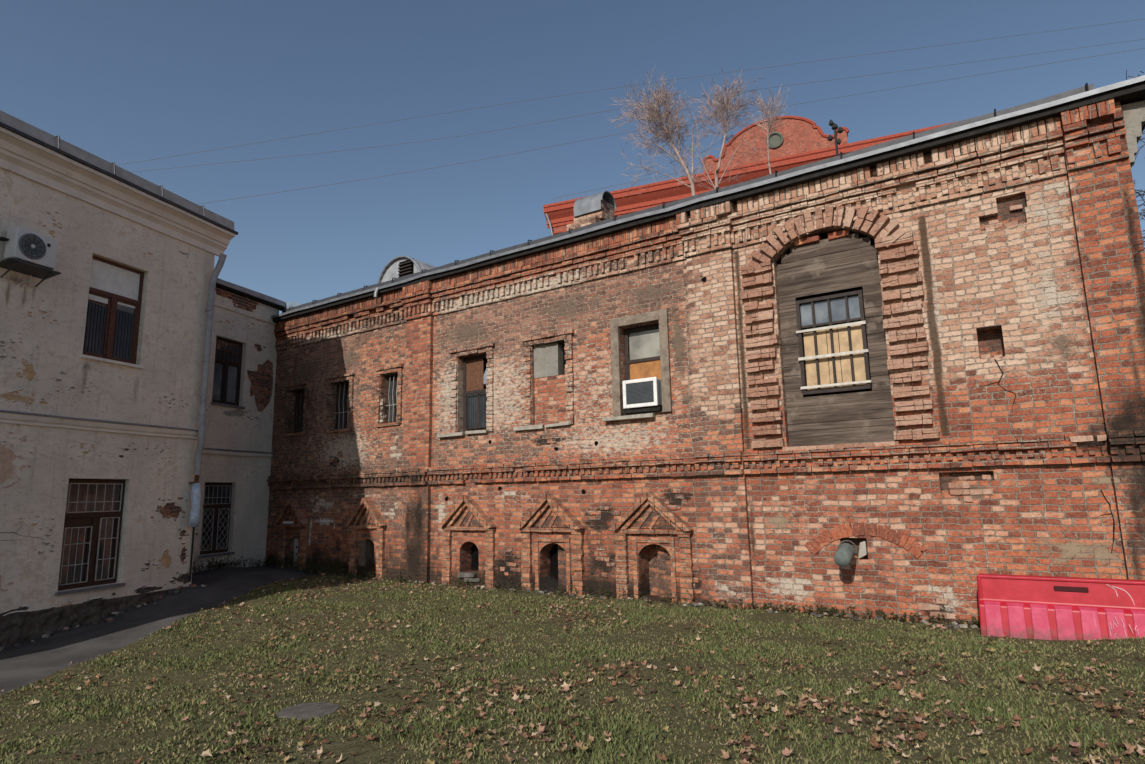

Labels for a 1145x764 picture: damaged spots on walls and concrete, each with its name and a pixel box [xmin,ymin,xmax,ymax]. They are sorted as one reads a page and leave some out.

flaking render [215,288,261,329]
peeling [0,332,92,406]
flaking render [247,342,273,429]
peeling [0,431,32,488]
flaking render [133,496,189,594]